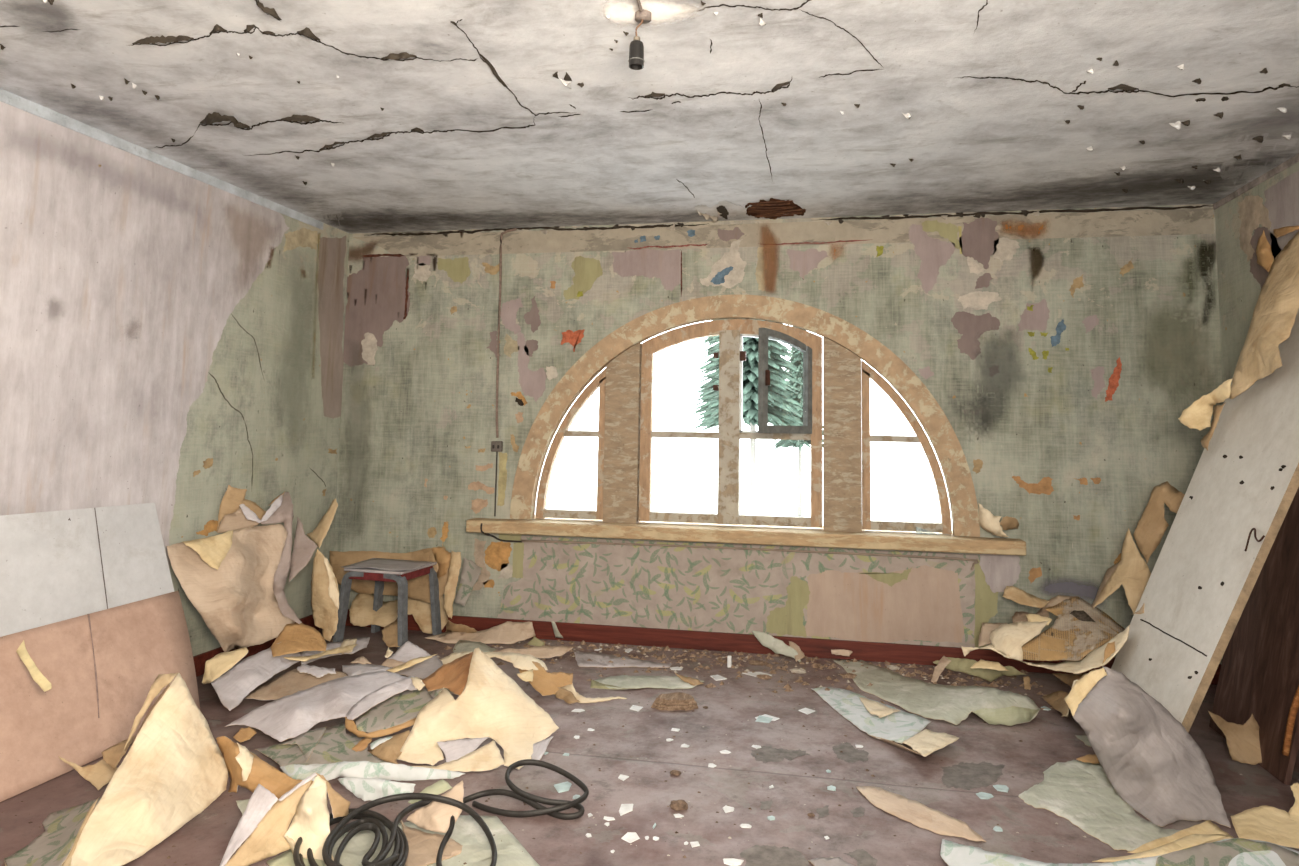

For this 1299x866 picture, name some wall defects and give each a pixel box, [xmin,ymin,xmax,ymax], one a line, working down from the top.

flaking render [604,0,718,51]
crack [129,0,580,156]
crack [620,0,883,175]
crack [962,76,1299,102]
flaking render [700,239,766,291]
rust [762,227,777,291]
flaking render [958,226,1020,275]
damp [1187,243,1215,323]
flaking render [361,332,378,365]
damp [964,335,1017,424]
crack [209,373,253,482]
peeling [805,565,964,643]